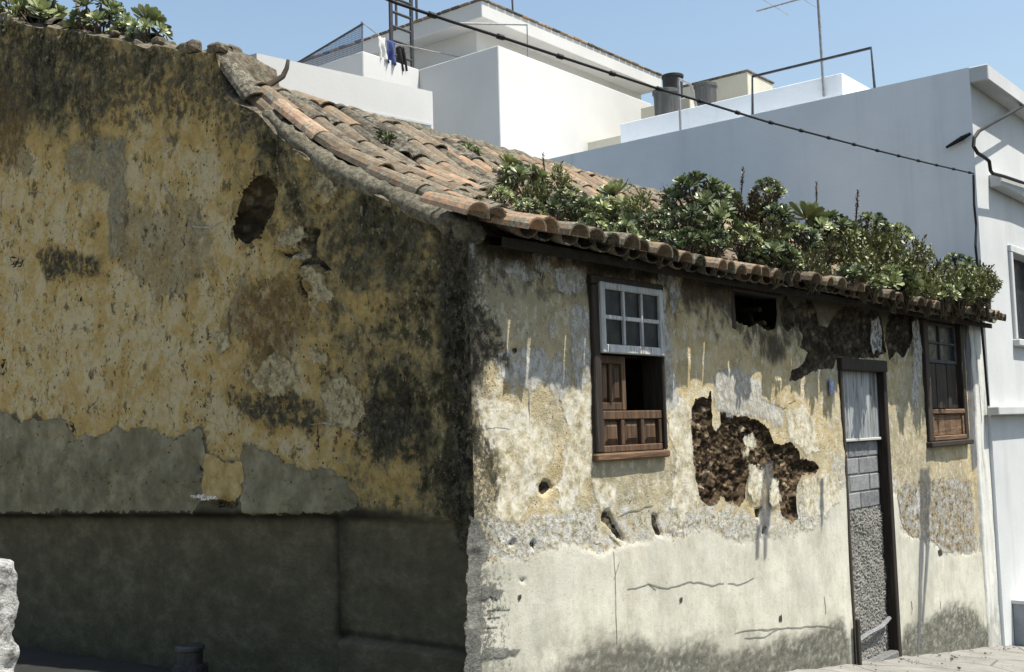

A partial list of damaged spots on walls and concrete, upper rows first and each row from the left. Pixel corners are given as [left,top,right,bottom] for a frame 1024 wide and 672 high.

leakage [40,246,98,280]
flaking render [230,171,278,249]
flaking render [776,296,922,407]
flaking render [651,274,840,543]
peeling [0,410,206,516]
peeling [218,444,357,517]
peeling [464,306,621,672]
peeling [897,476,976,556]
crack [609,535,751,645]